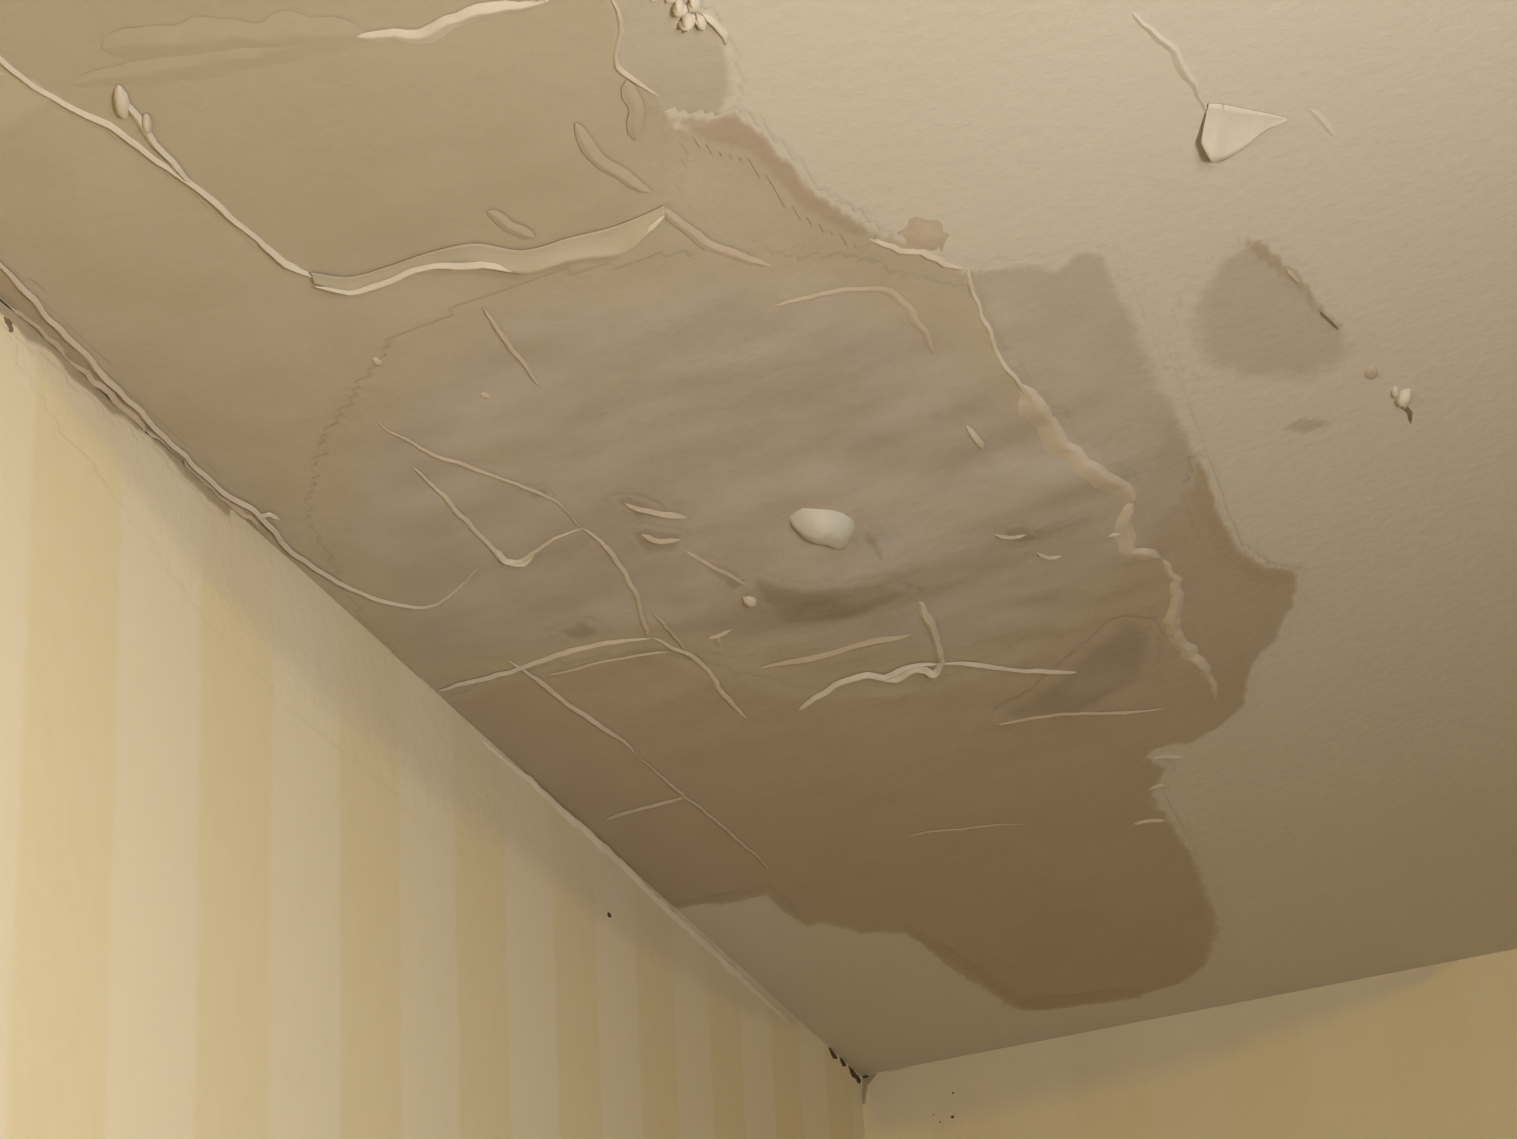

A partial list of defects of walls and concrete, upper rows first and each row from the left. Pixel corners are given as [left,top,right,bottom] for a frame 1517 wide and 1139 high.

peeling [0,0,744,296]
peeling [0,298,260,530]
damp [0,64,1378,1044]
peeling [869,216,1218,699]
damp [828,960,1463,1139]